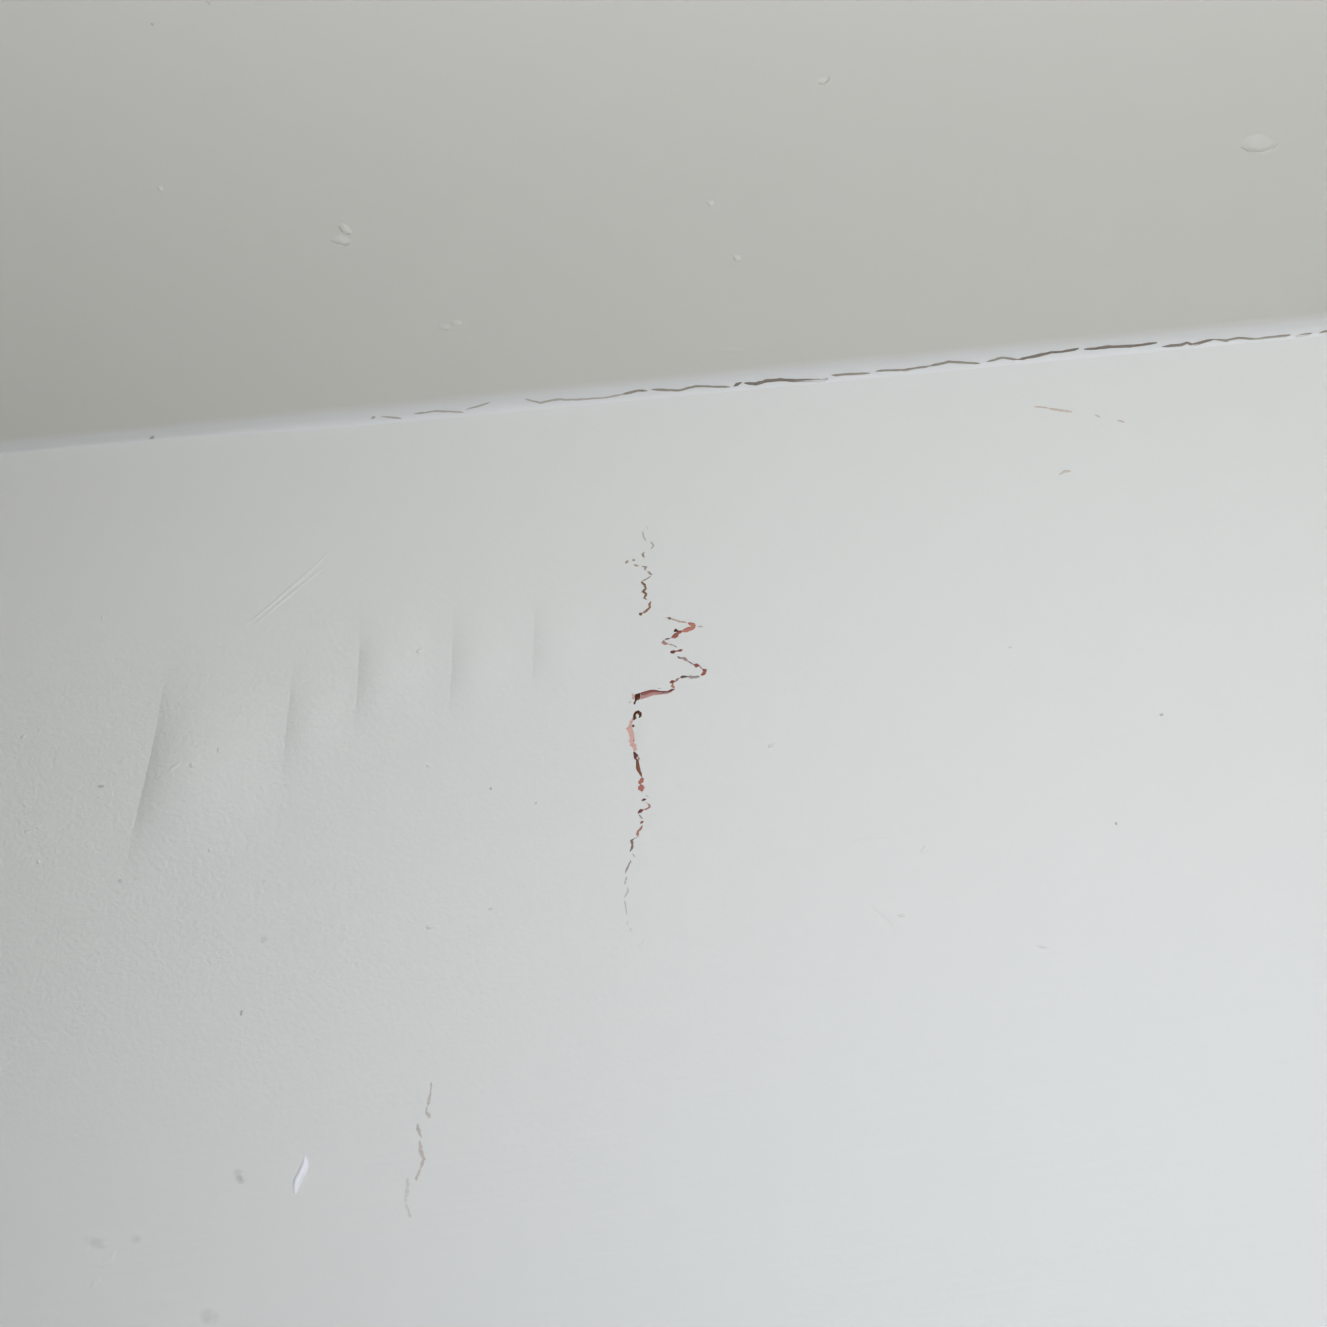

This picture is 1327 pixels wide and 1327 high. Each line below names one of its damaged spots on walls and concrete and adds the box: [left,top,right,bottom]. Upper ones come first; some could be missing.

crack [526,330,1327,404]
crack [371,402,490,419]
crack [624,533,707,931]